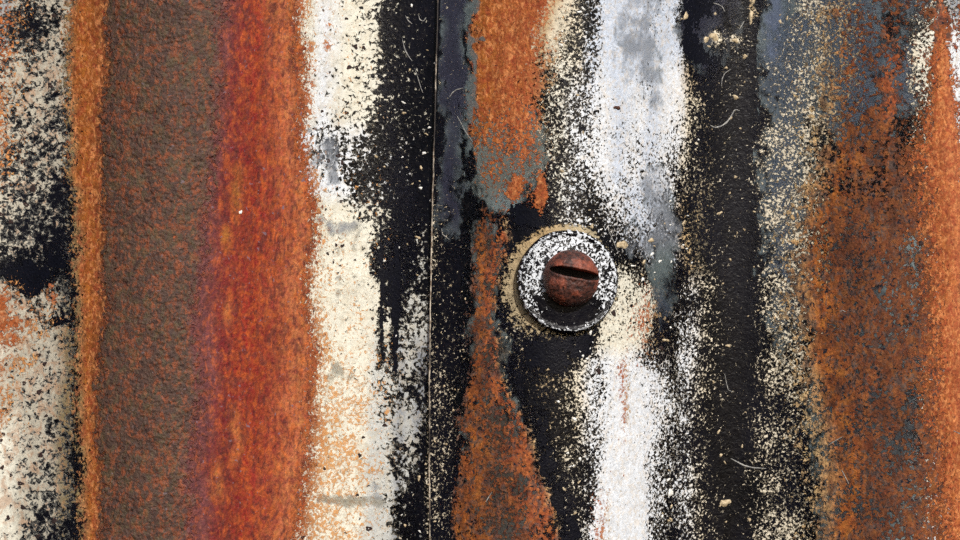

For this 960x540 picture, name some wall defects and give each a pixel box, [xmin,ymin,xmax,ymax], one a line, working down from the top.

rust [0,0,411,540]
rust [443,0,628,540]
rust [768,0,960,540]